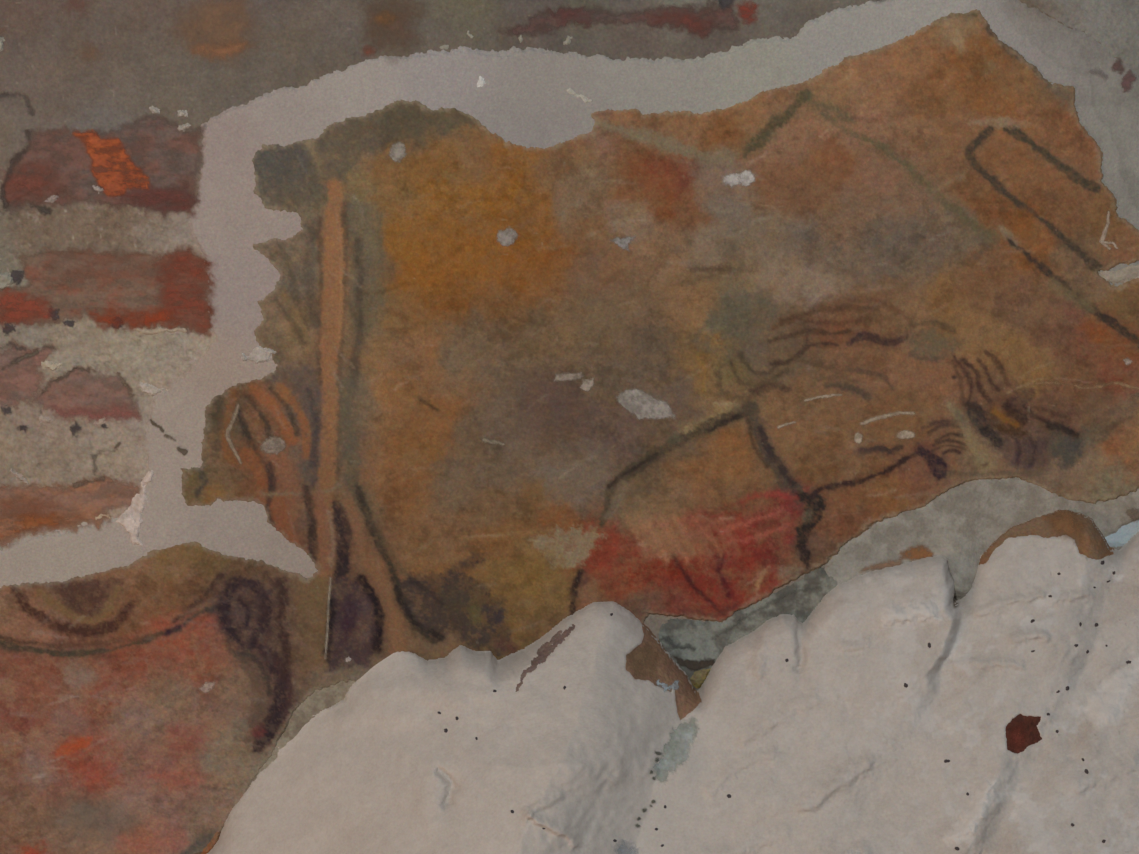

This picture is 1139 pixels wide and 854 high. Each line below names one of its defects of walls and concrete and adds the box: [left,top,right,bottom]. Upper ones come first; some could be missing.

flaking render [508,3,757,45]
spalling [390,142,406,162]
spalling [723,170,755,187]
spalling [497,228,517,246]
peeling [241,345,276,364]
spalling [554,372,594,391]
spalling [618,389,675,419]
peeling [898,431,914,439]
spalling [261,437,285,454]
peeling [979,510,1114,565]
peeling [515,624,575,692]
peeling [626,623,711,720]